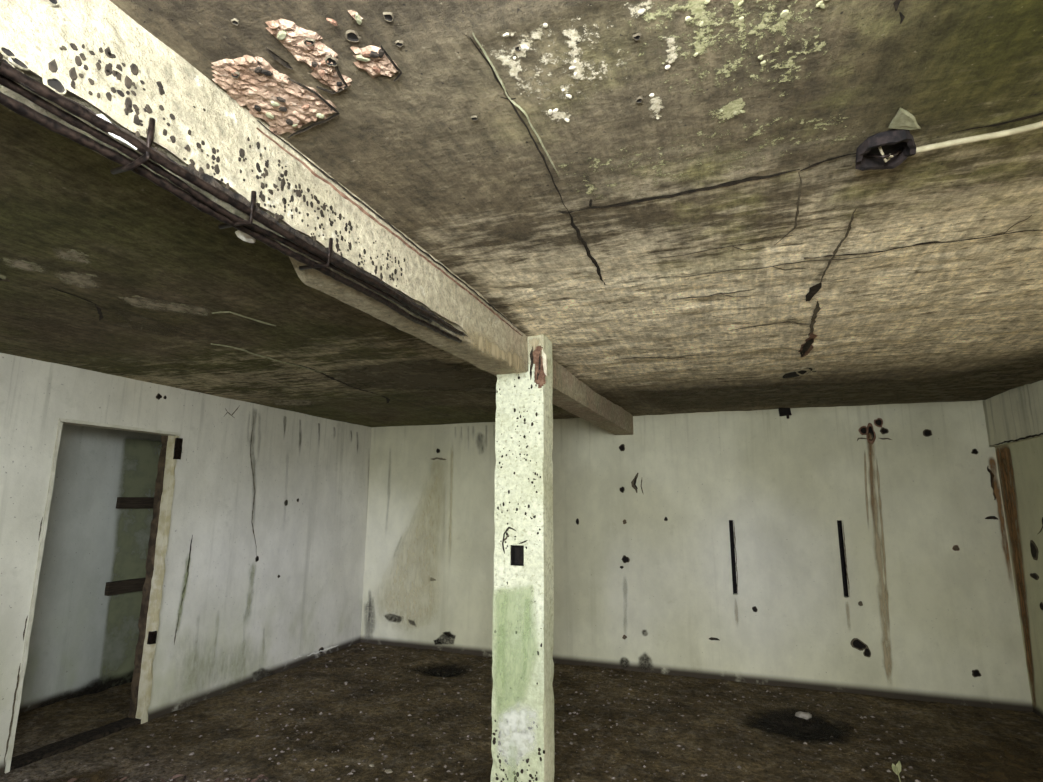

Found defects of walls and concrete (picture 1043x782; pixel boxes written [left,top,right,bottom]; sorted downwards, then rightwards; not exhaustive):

peeling [356,49,384,62]
spalling [0,53,468,343]
crack [464,32,1043,357]
crack [621,352,711,360]
corrosion [864,434,891,677]